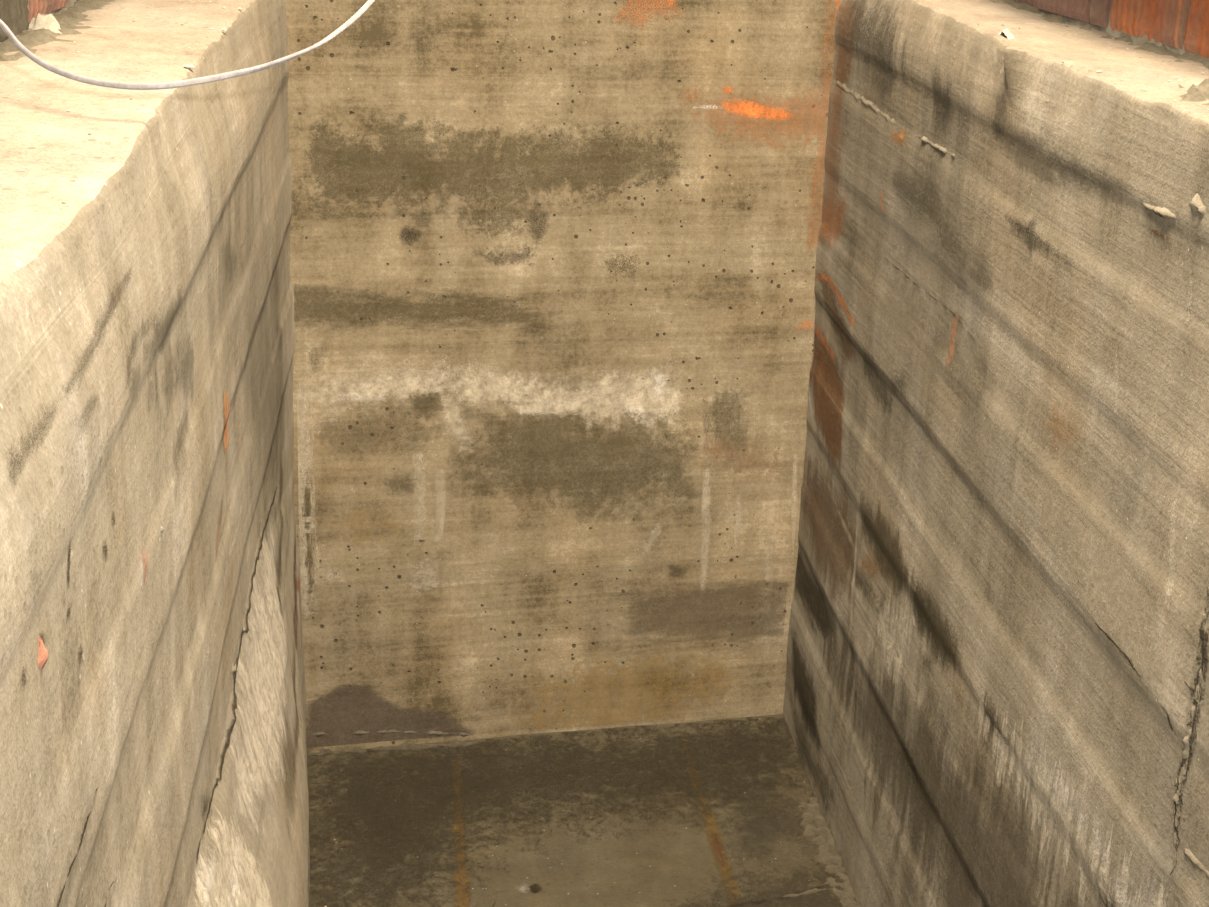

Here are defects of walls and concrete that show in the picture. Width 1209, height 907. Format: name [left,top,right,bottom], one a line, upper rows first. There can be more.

leakage [297,105,684,267]
corrosion [674,0,863,250]
leakage [126,282,195,500]
crack [195,488,277,868]
leakage [192,160,844,907]
leakage [791,0,1171,907]
crack [1095,623,1142,678]
crack [1158,568,1209,873]